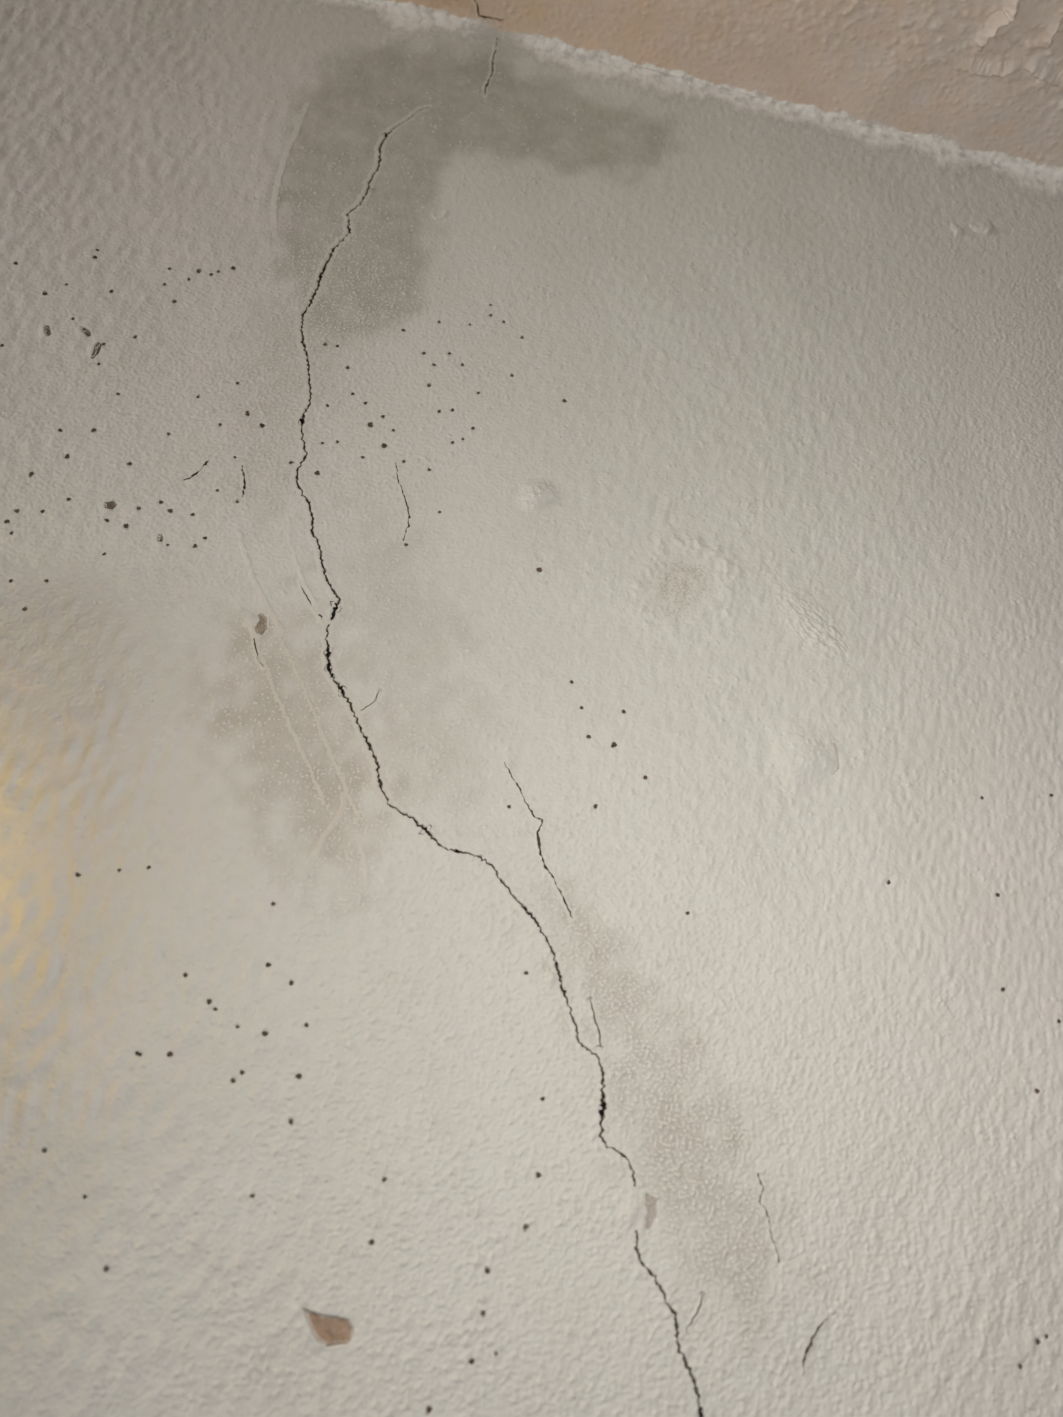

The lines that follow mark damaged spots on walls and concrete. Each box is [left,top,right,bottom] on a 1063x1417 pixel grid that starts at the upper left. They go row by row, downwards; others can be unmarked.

crack [472,0,504,96]
peeling [969,0,1022,54]
crack [290,104,710,1417]
peeling [289,1304,353,1358]